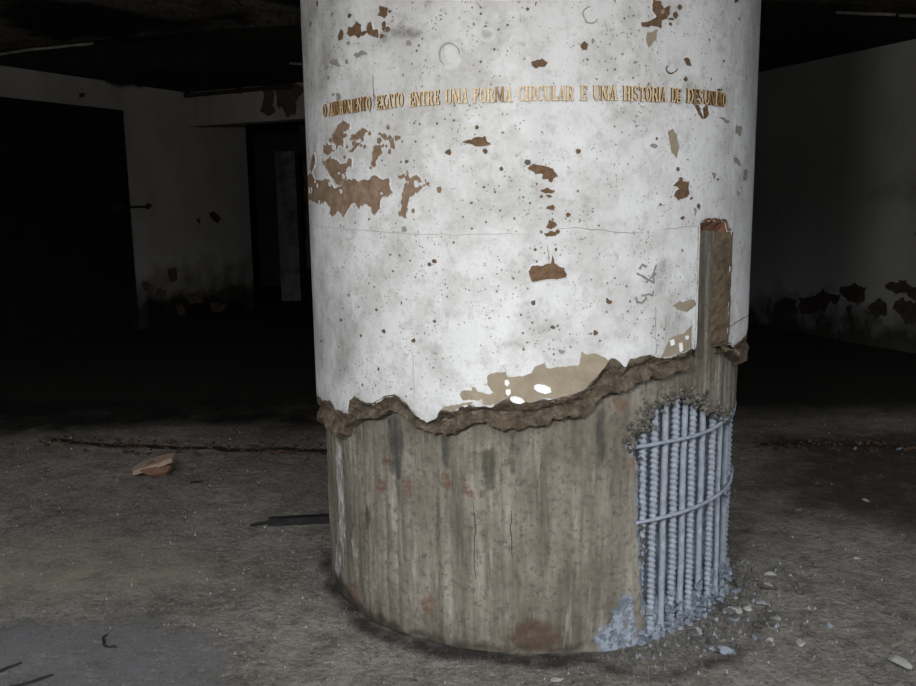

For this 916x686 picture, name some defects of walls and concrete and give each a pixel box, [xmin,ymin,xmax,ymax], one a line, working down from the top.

peeling [324,6,392,79]
peeling [640,0,682,49]
peeling [260,83,442,267]
peeling [524,160,560,237]
peeling [527,248,568,284]
flaking render [650,128,749,366]
peeling [774,280,916,325]
spalling [317,325,735,652]